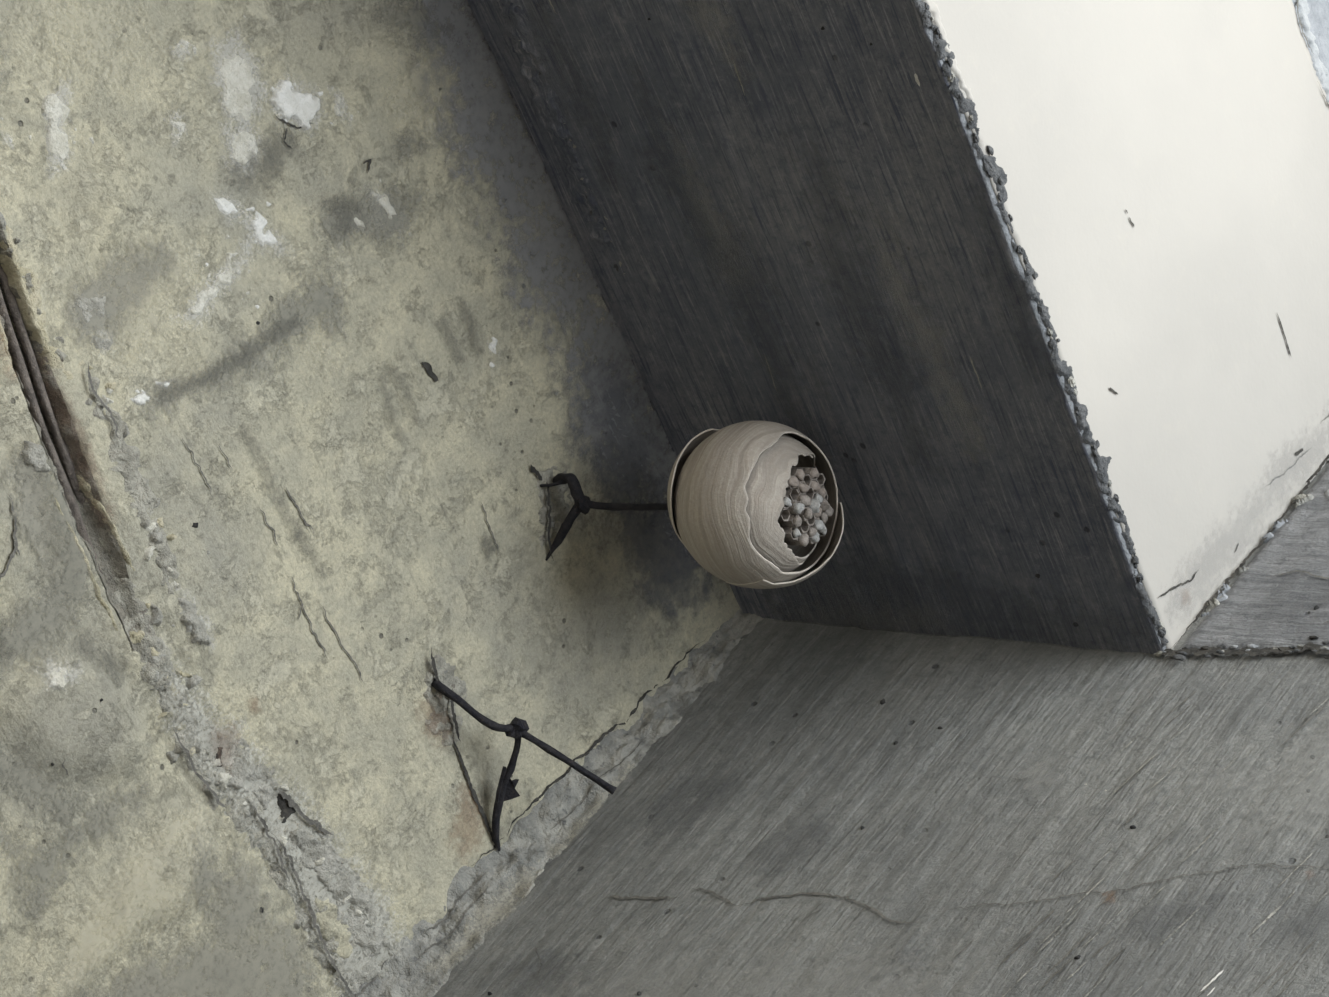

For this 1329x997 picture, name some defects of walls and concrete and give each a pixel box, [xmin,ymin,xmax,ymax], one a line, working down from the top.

peeling [215,52,359,168]
leakage [321,183,422,248]
peeling [370,179,398,219]
leakage [380,0,712,617]
crack [0,496,20,580]
spalling [0,198,410,997]
spalling [423,647,499,852]